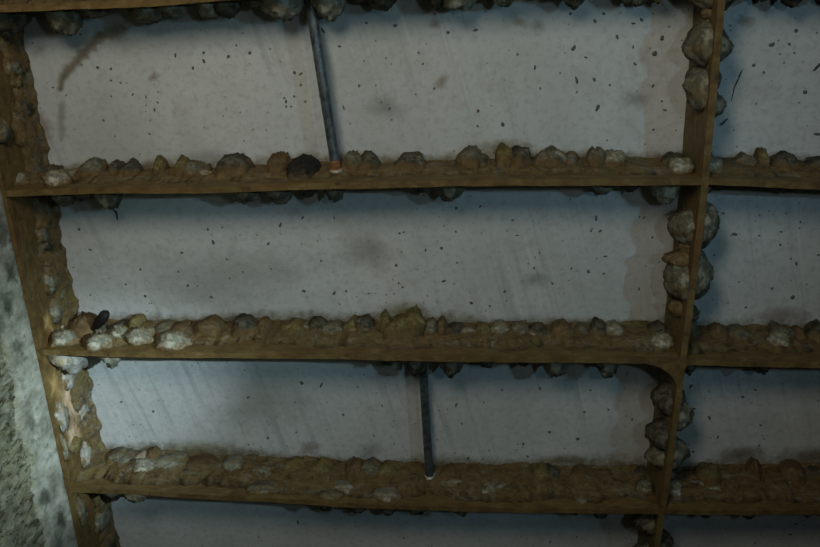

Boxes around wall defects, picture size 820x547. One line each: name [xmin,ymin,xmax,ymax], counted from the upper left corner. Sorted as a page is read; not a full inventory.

damp [59,33,103,90]